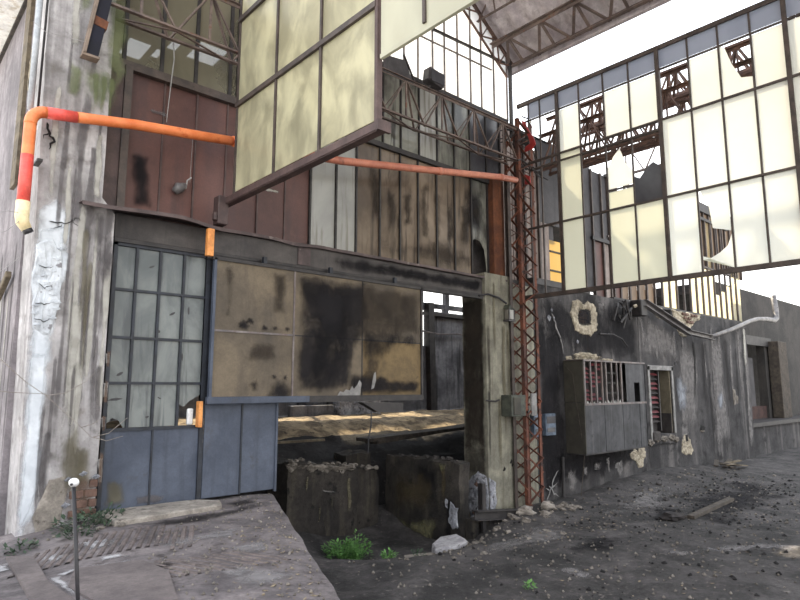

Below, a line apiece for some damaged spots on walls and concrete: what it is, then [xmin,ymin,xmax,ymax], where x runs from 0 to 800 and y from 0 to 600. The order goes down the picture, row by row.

leakage [68,0,80,82]
leakage [82,74,114,113]
peeling [39,201,69,281]
leakage [35,120,113,506]
spalling [570,299,598,337]
spalling [655,308,700,337]
spalling [584,434,693,475]
spalling [468,471,497,518]